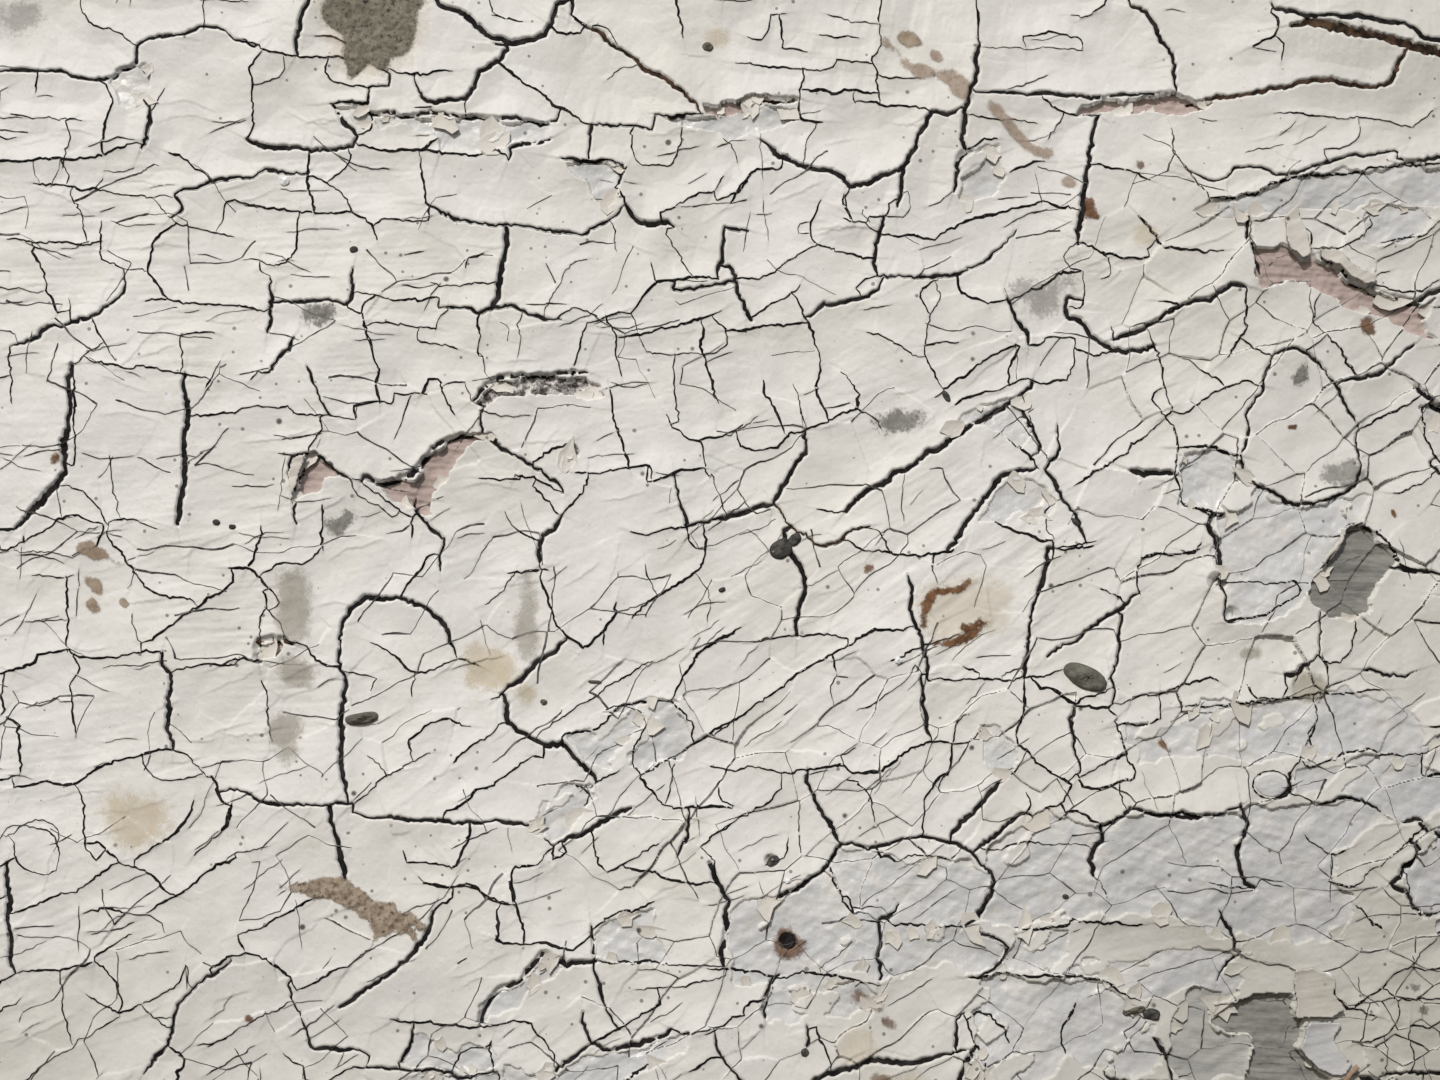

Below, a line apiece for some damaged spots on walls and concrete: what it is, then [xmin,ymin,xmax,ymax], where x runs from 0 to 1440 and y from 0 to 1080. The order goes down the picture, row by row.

crack [1128,0,1440,121]
crack [1171,110,1440,202]
peeling [116,213,255,290]
peeling [282,399,497,516]
peeling [283,523,671,720]
peeling [399,134,1440,1080]
crack [1170,612,1382,746]
peeling [189,738,363,921]
crack [1277,747,1440,812]
corrosion [775,929,805,960]
crack [968,933,1141,1054]
crack [1292,817,1440,1080]